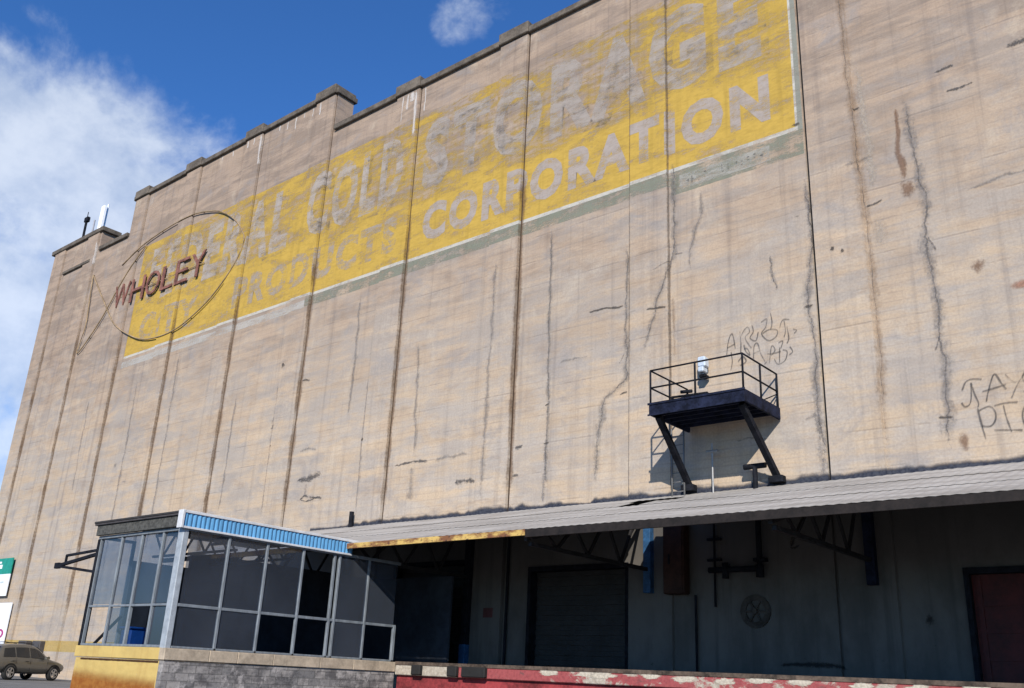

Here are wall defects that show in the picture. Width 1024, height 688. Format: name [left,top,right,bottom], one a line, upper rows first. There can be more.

crack [590,203,682,331]
peeling [640,674,697,682]